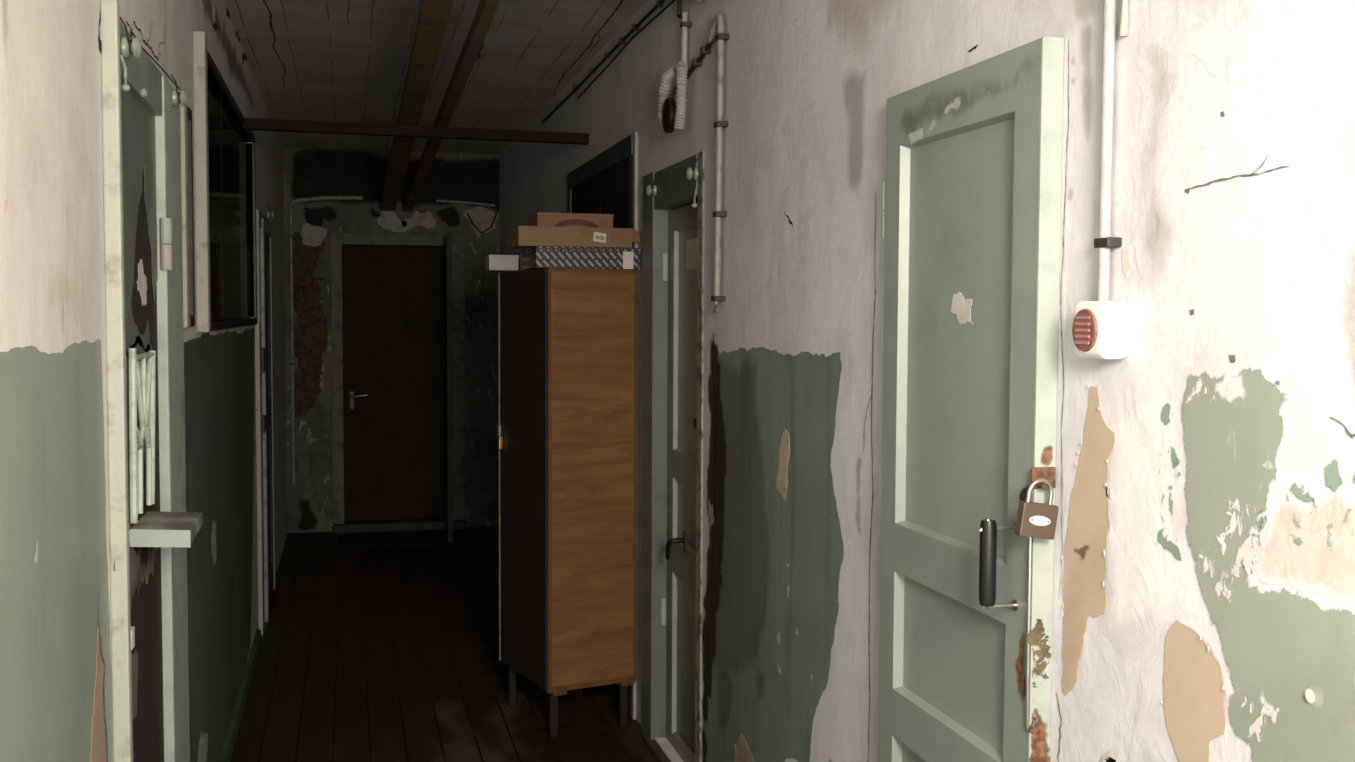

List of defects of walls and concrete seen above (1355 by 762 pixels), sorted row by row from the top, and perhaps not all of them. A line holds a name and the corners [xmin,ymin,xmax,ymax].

crack [98,0,166,72]
crack [263,0,286,91]
crack [1187,157,1290,190]
spalling [289,223,328,422]
peeling [775,429,790,499]
corrosion [1041,447,1052,465]
peeling [1027,385,1115,762]
peeling [1158,355,1355,762]
peeling [90,594,108,762]
corrosion [1016,635,1026,699]
corrosion [1030,709,1051,762]
spalling [1099,750,1122,762]